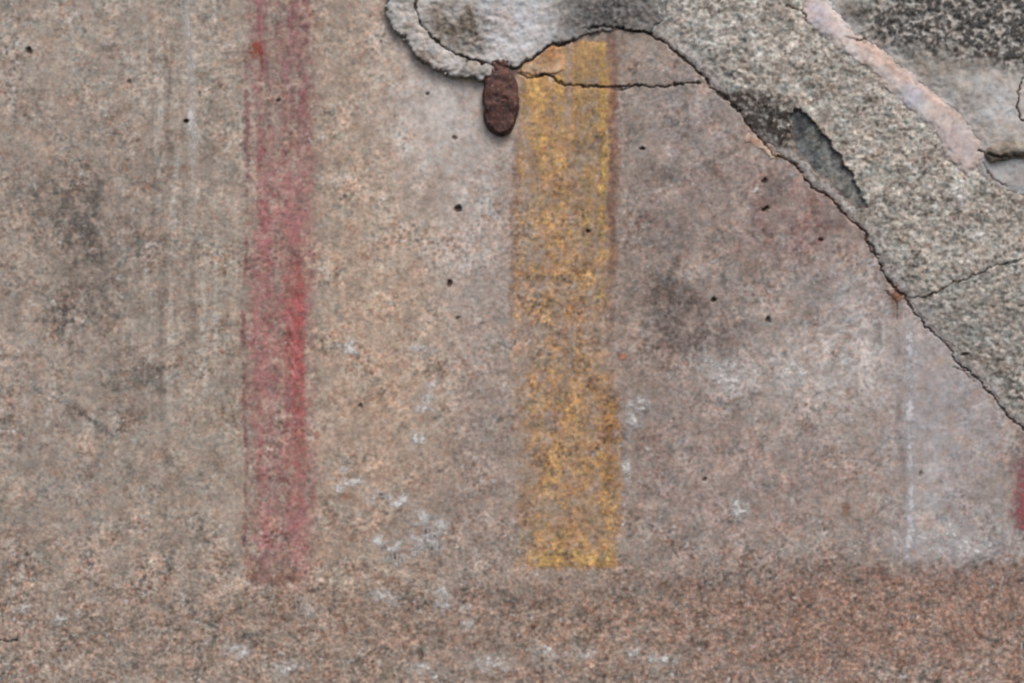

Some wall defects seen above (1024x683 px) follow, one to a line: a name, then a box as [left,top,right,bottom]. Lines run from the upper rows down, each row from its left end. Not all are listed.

crack [414,0,485,65]
crack [1015,82,1024,121]
crack [512,25,981,332]
spalling [790,109,864,208]
crack [980,150,1023,180]